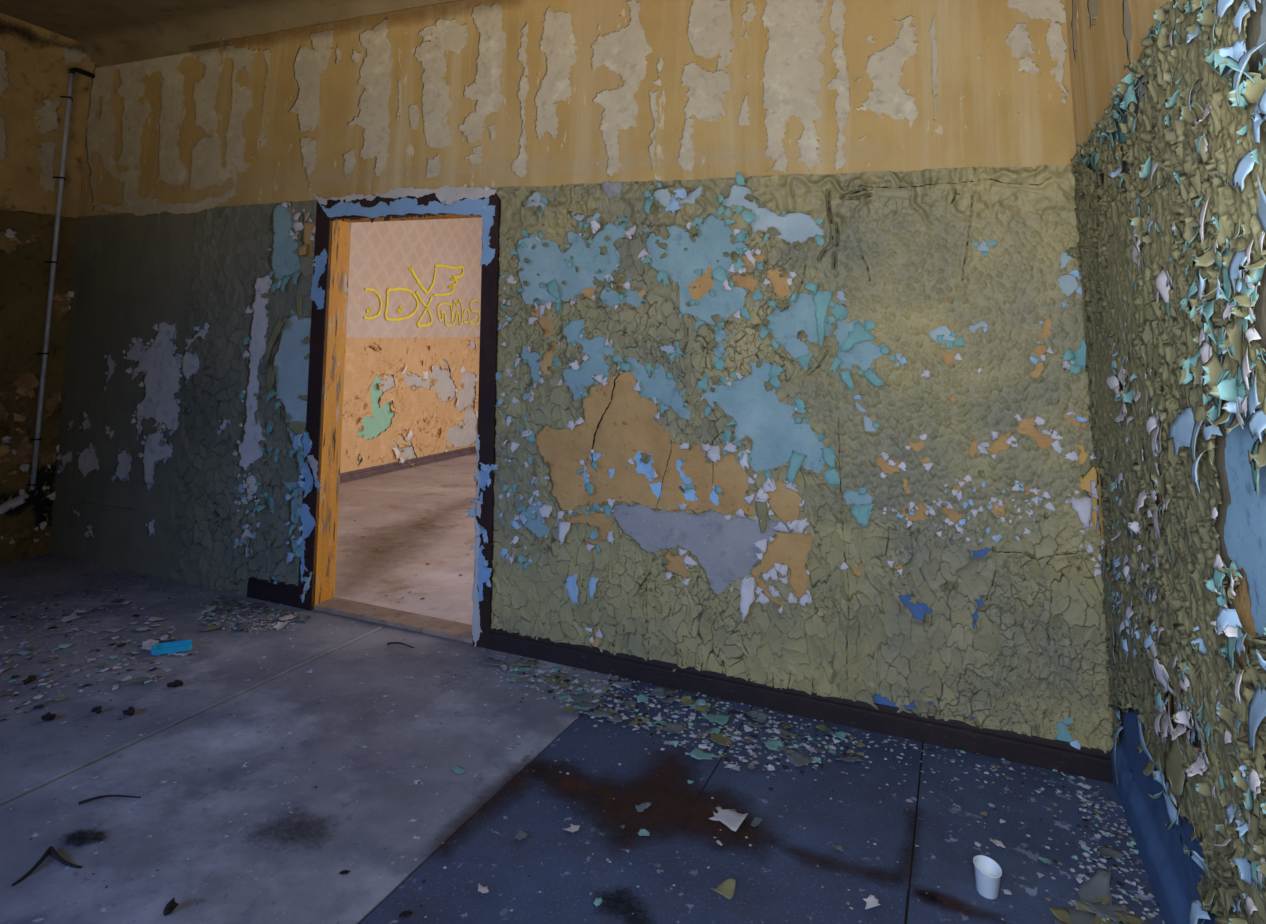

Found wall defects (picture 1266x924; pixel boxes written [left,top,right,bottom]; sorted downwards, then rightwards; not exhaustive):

peeling [33,99,60,192]
peeling [61,39,271,216]
crack [799,177,1051,288]
peeling [217,201,327,603]
crack [591,371,625,462]
peeling [288,0,1266,924]
crack [986,551,1079,601]